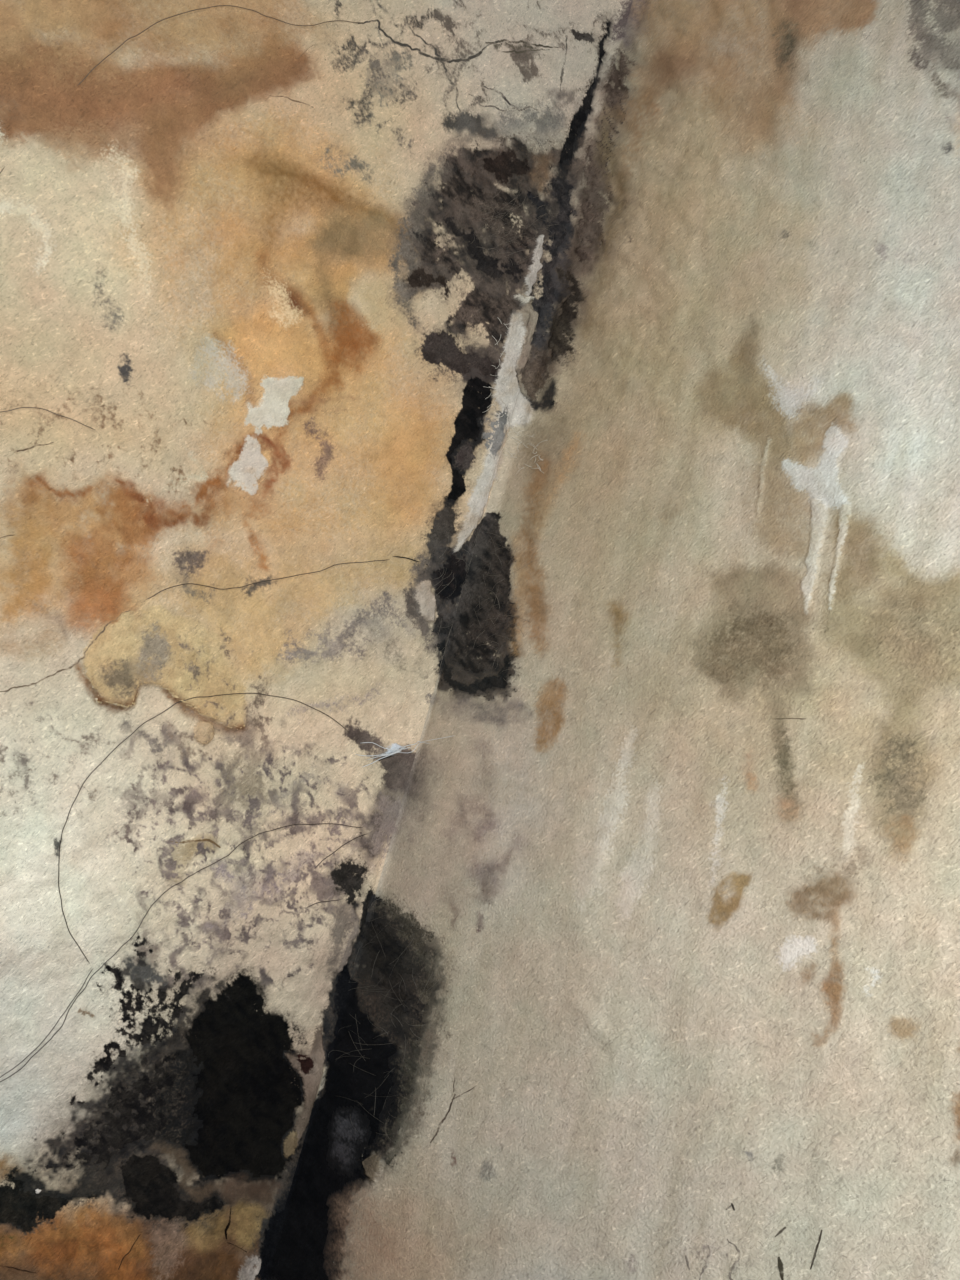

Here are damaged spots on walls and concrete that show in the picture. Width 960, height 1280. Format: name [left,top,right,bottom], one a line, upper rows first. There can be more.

rust [0,0,343,216]
crack [17,442,54,452]
rust [0,293,384,644]
flaking render [177,322,306,498]
damp [0,0,651,1280]
damp [683,309,960,895]
crack [430,1078,477,1143]
rust [0,1211,251,1280]
rust [323,1180,420,1280]